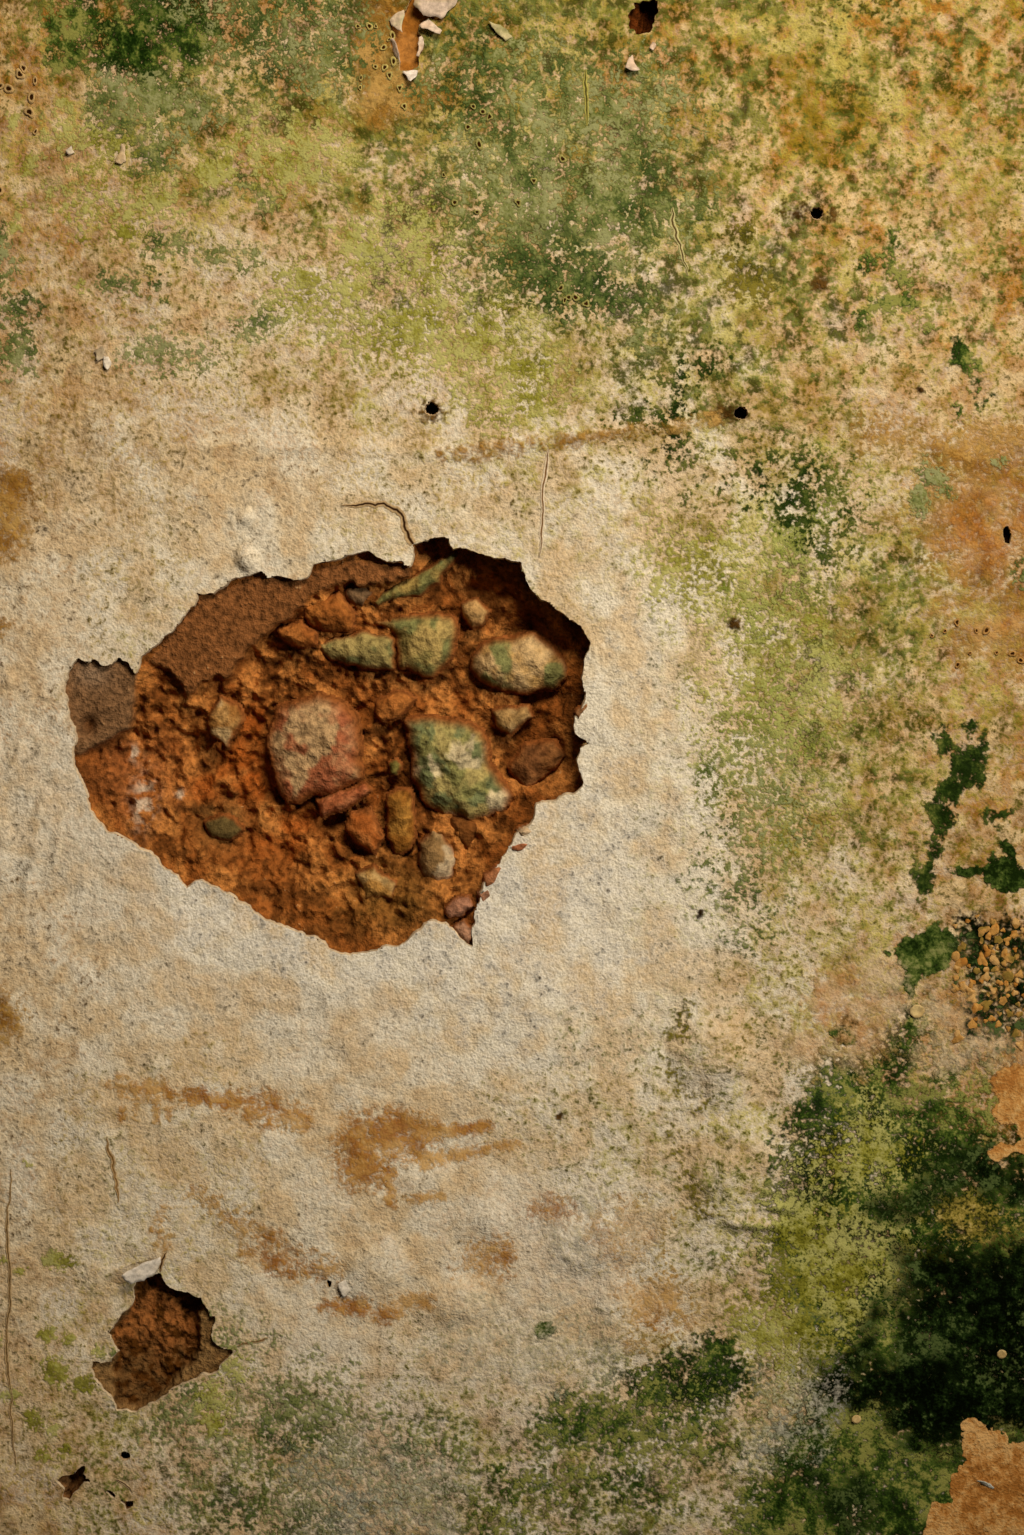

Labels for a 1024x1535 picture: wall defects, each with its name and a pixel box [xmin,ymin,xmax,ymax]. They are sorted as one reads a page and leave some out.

peeling [355,0,458,111]
spalling [930,618,990,638]
spalling [64,537,591,955]
peeling [790,957,898,1057]
peeling [913,998,1024,1162]
spalling [91,1252,268,1413]
peeling [923,1418,1024,1535]